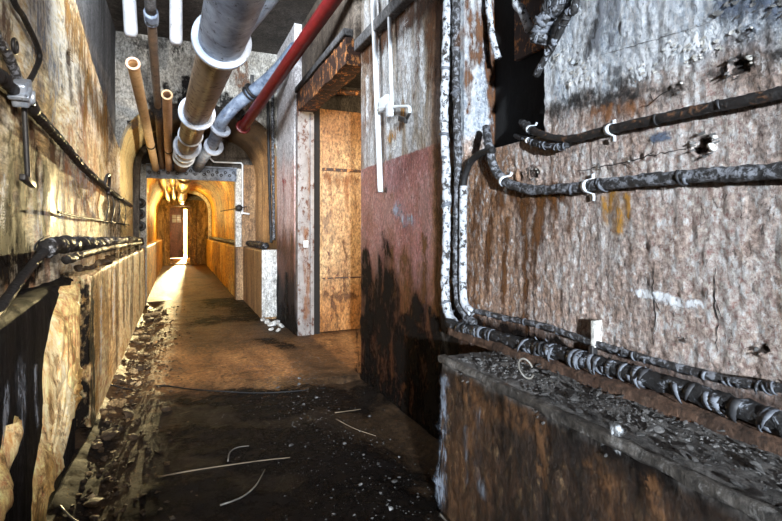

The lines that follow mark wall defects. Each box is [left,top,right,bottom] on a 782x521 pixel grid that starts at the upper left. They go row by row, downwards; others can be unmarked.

peeling [630,0,782,81]
corrosion [62,102,99,227]
damp [433,141,441,194]
corrosion [602,190,631,234]
corrosion [483,188,571,333]
crack [713,268,721,352]
damp [119,205,460,521]